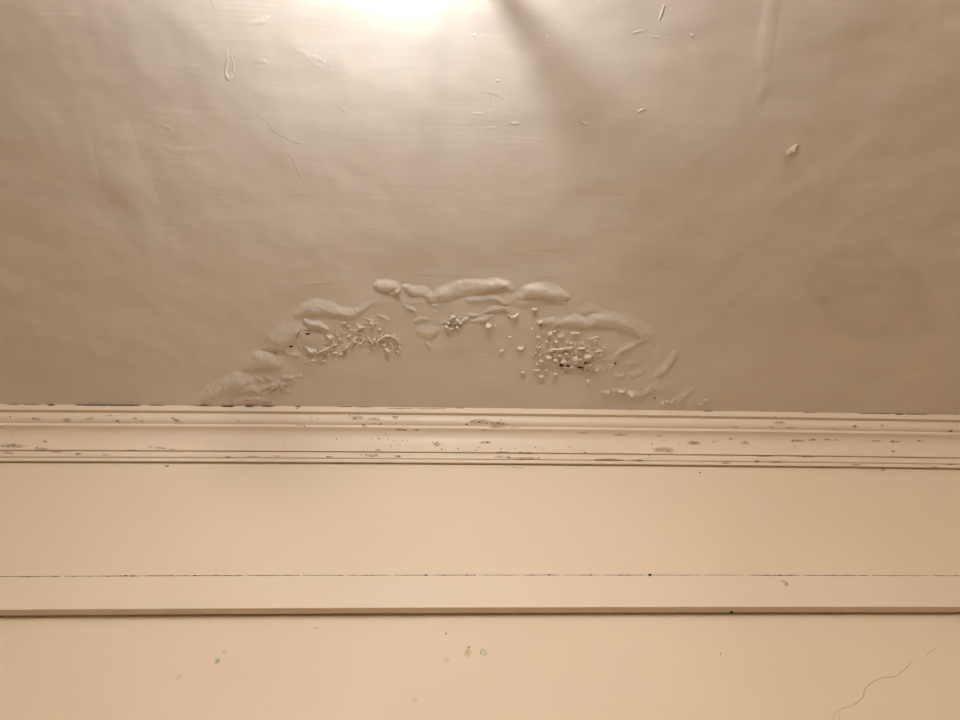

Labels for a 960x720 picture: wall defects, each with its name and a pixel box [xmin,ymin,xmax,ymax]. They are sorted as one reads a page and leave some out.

peeling [303,320,404,363]
peeling [508,320,616,384]
crack [833,648,936,720]